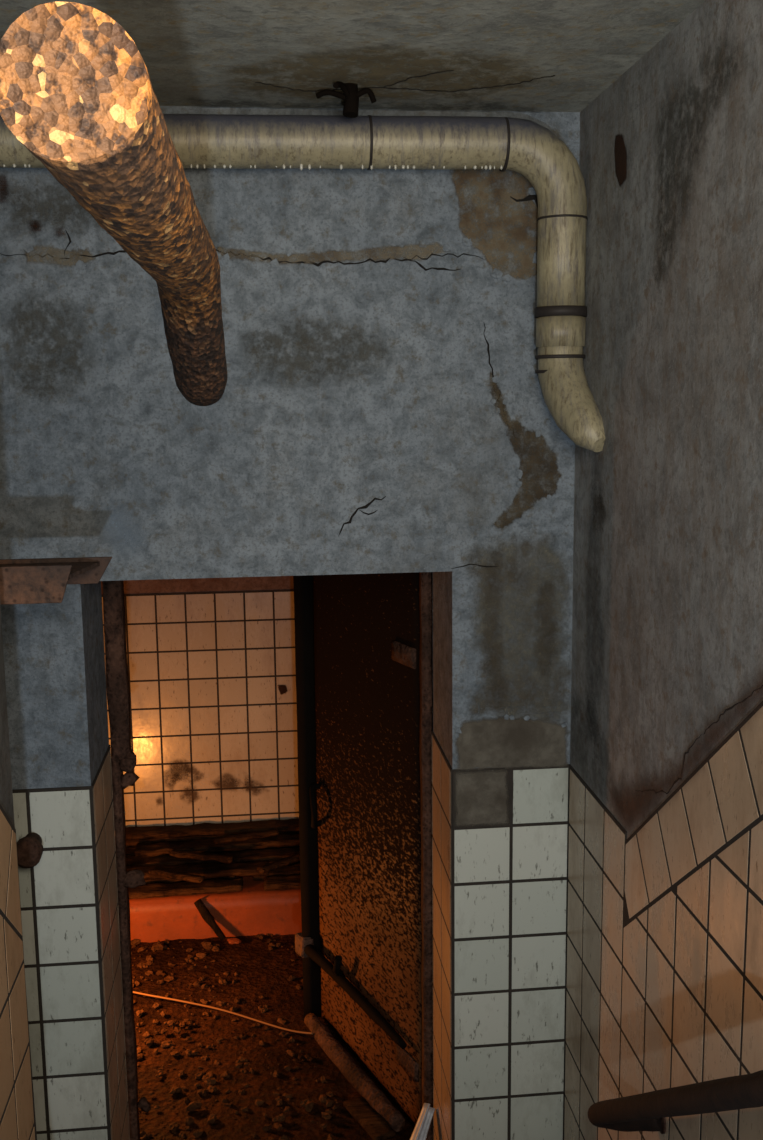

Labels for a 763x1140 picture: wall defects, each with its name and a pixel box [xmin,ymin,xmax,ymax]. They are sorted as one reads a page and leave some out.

crack [0,231,125,259]
crack [216,249,483,271]
flaking render [217,169,538,282]
peeling [484,324,561,531]
crack [338,496,386,537]
leakage [471,538,571,721]